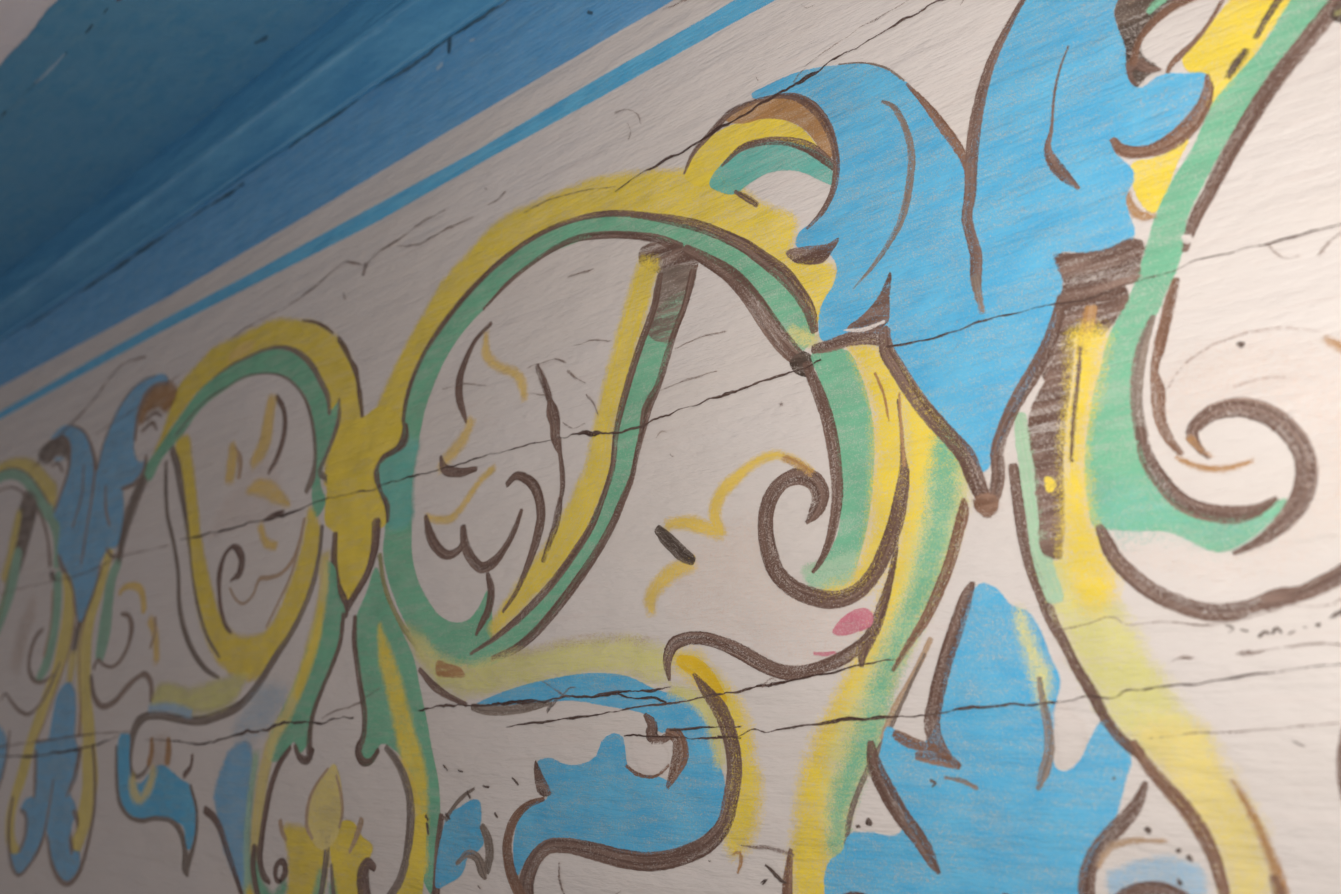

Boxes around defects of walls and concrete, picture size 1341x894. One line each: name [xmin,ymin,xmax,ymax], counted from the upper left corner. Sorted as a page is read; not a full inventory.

crack [886,224,1341,348]
crack [1,356,821,594]
crack [419,599,1341,740]